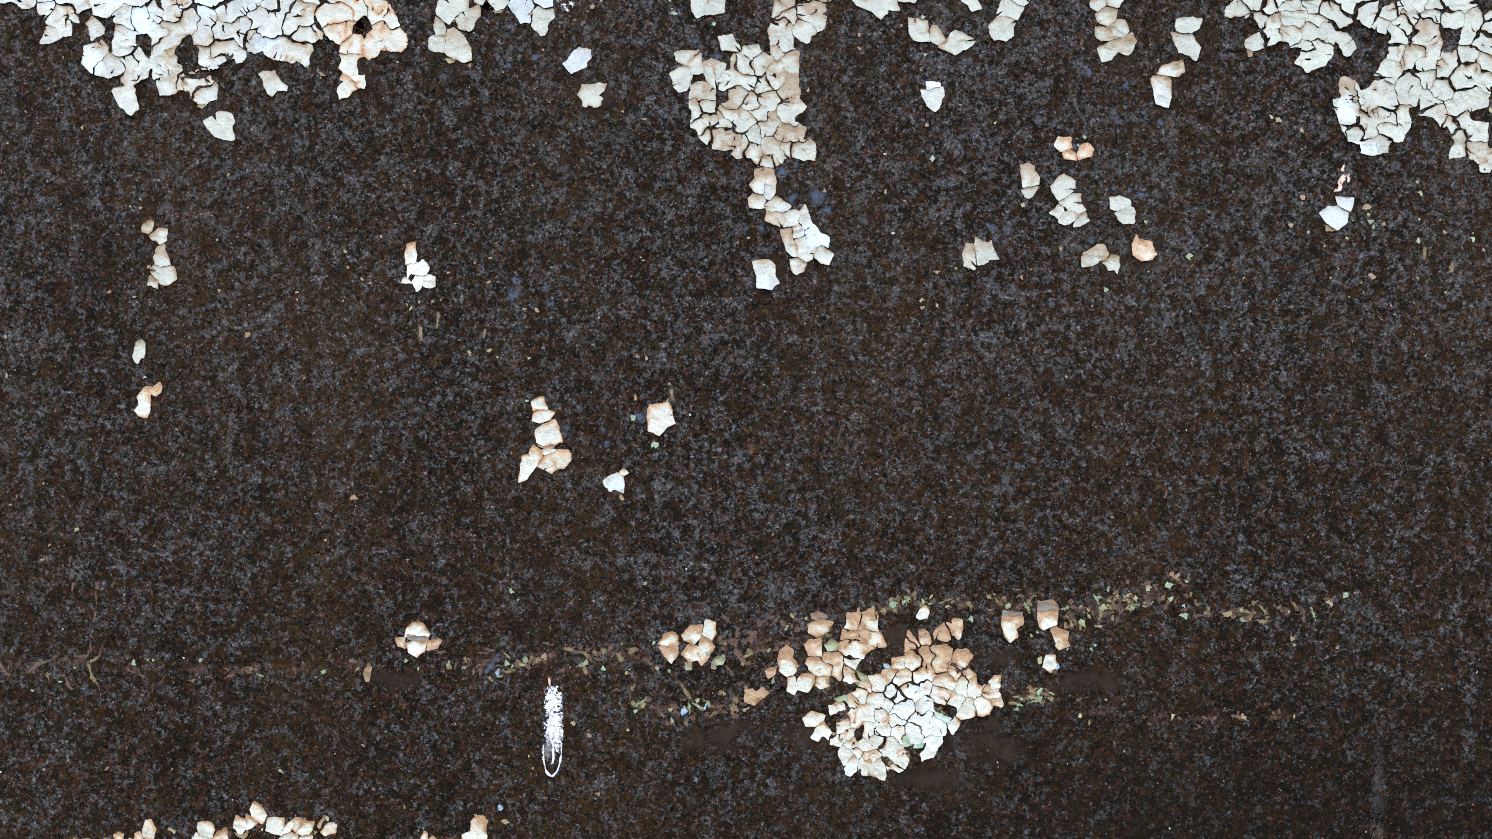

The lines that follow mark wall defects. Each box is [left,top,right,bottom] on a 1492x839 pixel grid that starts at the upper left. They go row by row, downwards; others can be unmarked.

peeling [428,0,555,69]
peeling [852,0,1030,60]
peeling [0,0,408,147]
peeling [669,0,834,290]
peeling [518,396,572,483]
corrosion [872,588,1036,646]
corrosion [1061,573,1334,631]
corrosion [0,640,101,696]
corrosion [435,642,659,682]
corrosion [612,614,814,726]
peeling [744,590,1108,781]
corrosion [1008,685,1055,711]